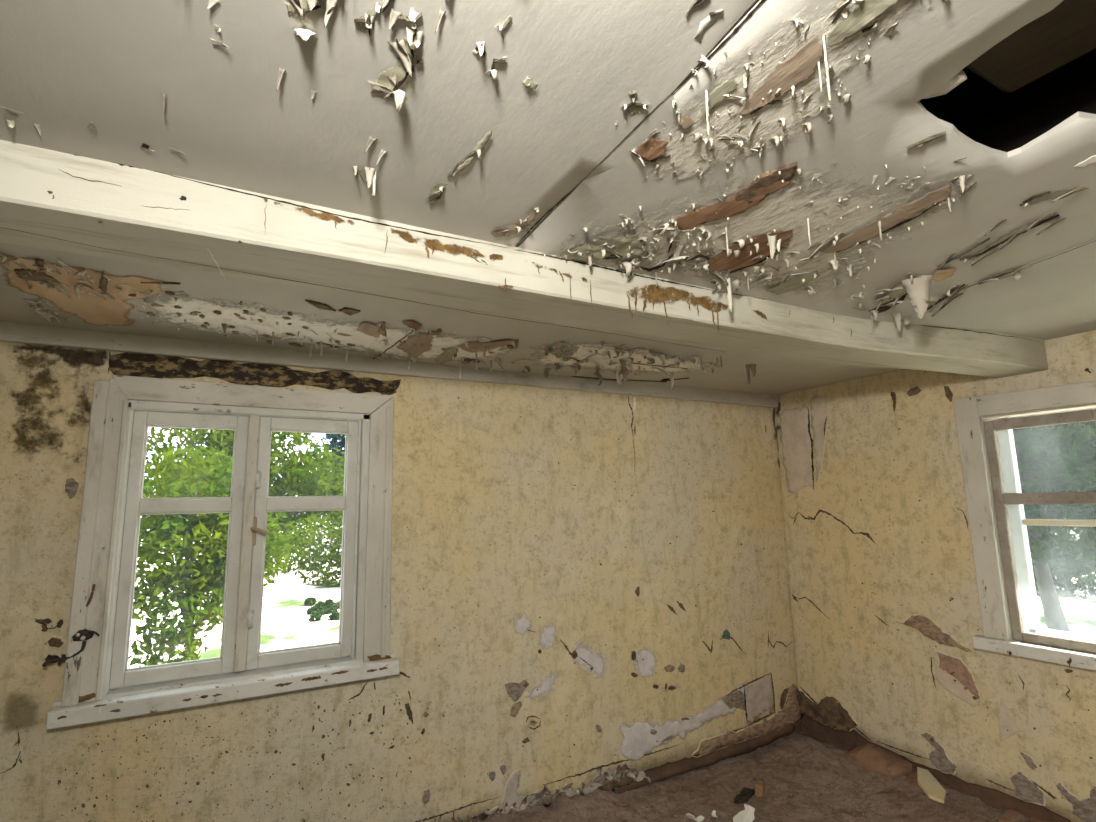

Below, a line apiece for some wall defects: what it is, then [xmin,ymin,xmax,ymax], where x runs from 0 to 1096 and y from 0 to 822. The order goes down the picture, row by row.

peeling [283,0,339,41]
peeling [354,0,446,113]
peeling [472,41,508,80]
peeling [352,136,388,196]
peeling [543,0,1089,332]
peeling [0,254,722,395]
water stain [12,344,107,453]
peeling [760,395,829,497]
crack [788,510,879,547]
spalling [349,654,429,734]
peeling [894,614,981,707]
peeling [446,673,858,822]